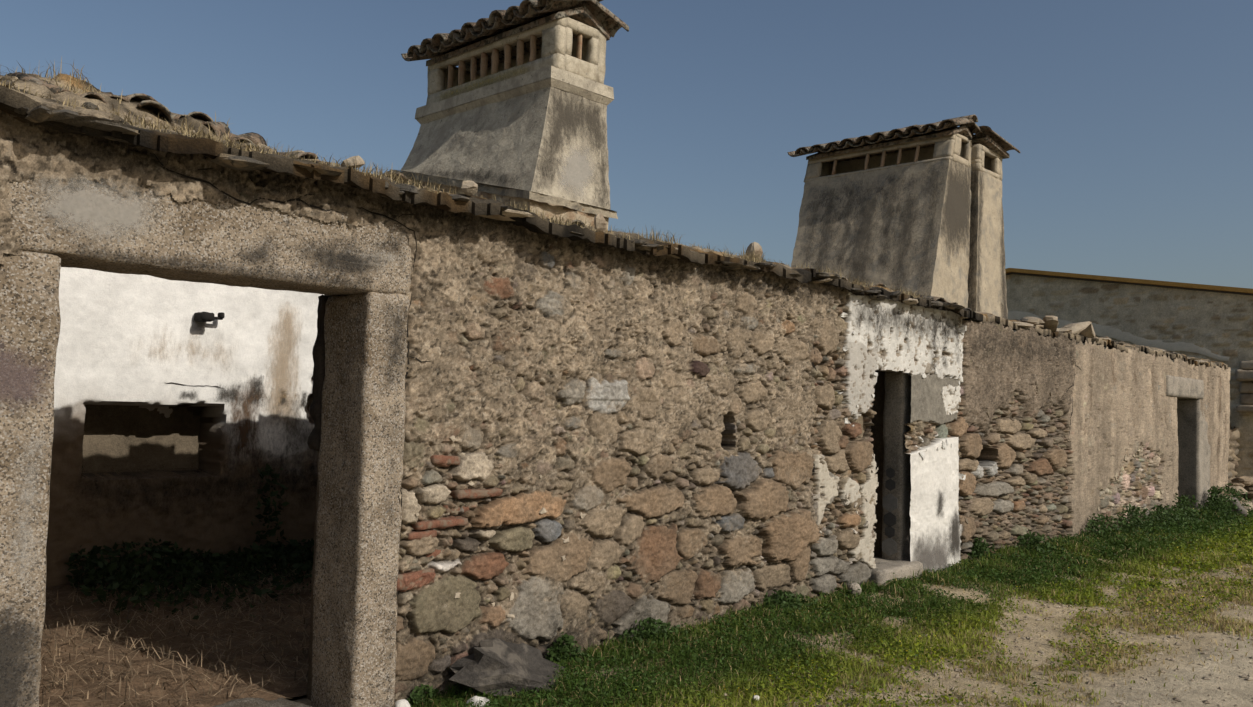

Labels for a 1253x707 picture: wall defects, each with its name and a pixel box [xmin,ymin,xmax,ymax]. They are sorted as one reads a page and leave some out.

crack [133,150,431,391]
damp [81,378,317,513]
spalling [811,292,1074,572]